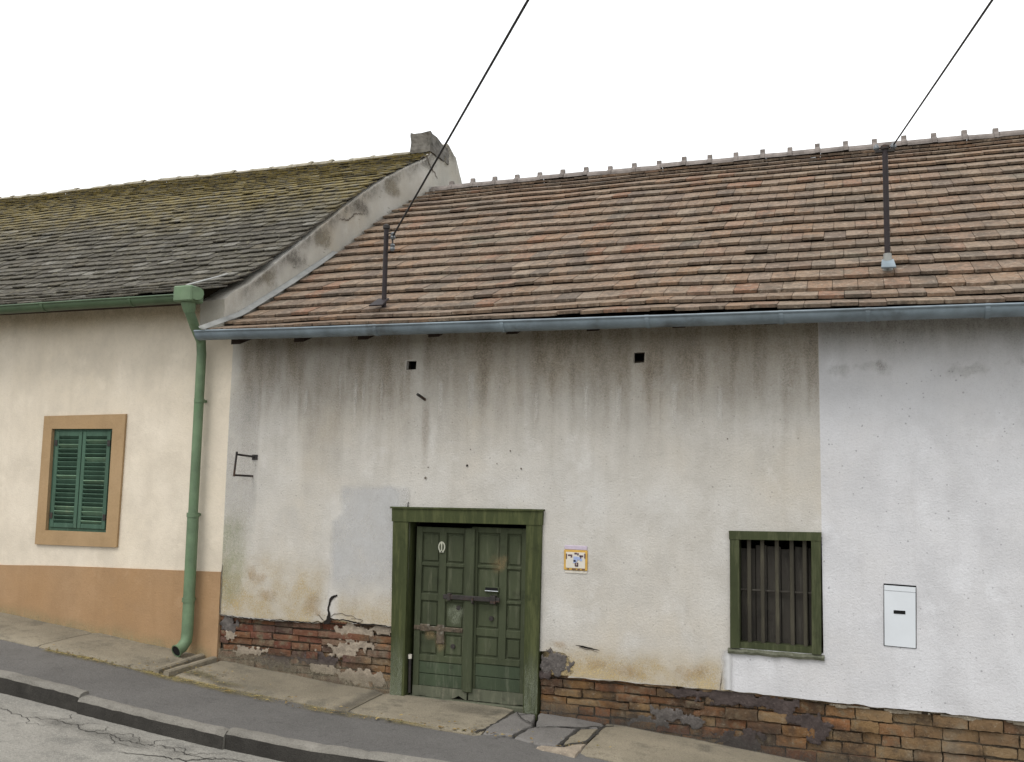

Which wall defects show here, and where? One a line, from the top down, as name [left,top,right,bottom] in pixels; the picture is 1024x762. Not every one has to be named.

crack [219,570,391,627]
spalling [219,616,402,696]
spalling [524,647,1024,726]